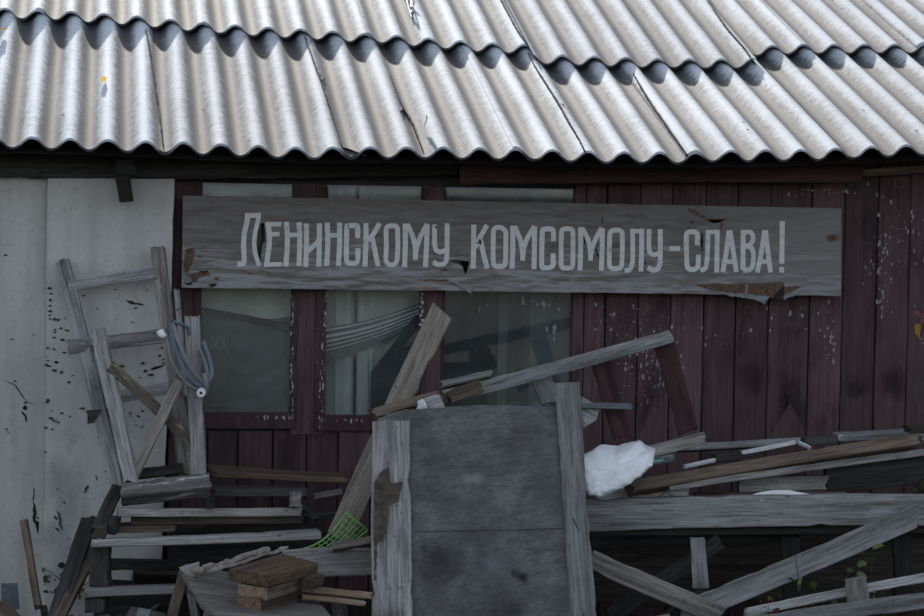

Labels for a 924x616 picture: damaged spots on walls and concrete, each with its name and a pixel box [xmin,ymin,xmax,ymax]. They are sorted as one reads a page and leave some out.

spalling [44,287,74,384]